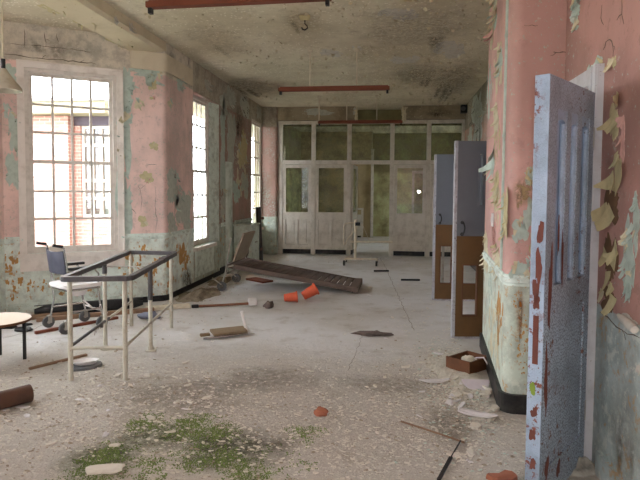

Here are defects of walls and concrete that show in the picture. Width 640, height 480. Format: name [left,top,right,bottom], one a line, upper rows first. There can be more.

peeling [587,55,617,73]
peeling [115,67,165,286]
peeling [167,167,192,235]
peeling [219,85,250,223]
peeling [468,0,564,370]
peeling [591,92,640,334]
crack [600,312,639,340]